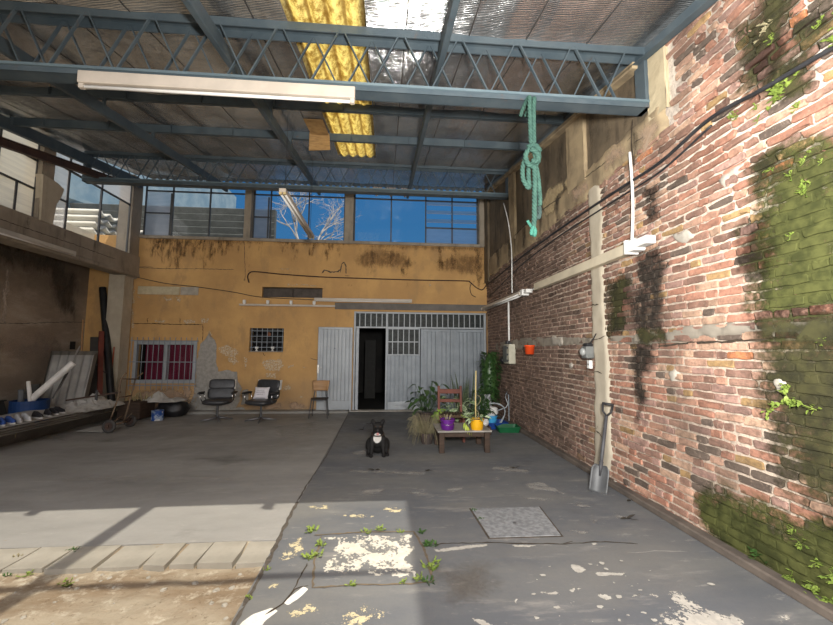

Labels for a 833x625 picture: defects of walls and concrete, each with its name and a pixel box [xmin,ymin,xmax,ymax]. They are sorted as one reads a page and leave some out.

leakage [752,151,789,190]
leakage [604,273,633,339]
leakage [636,328,667,345]
peeling [184,318,249,410]
peeling [323,534,416,578]
peeling [659,591,744,625]